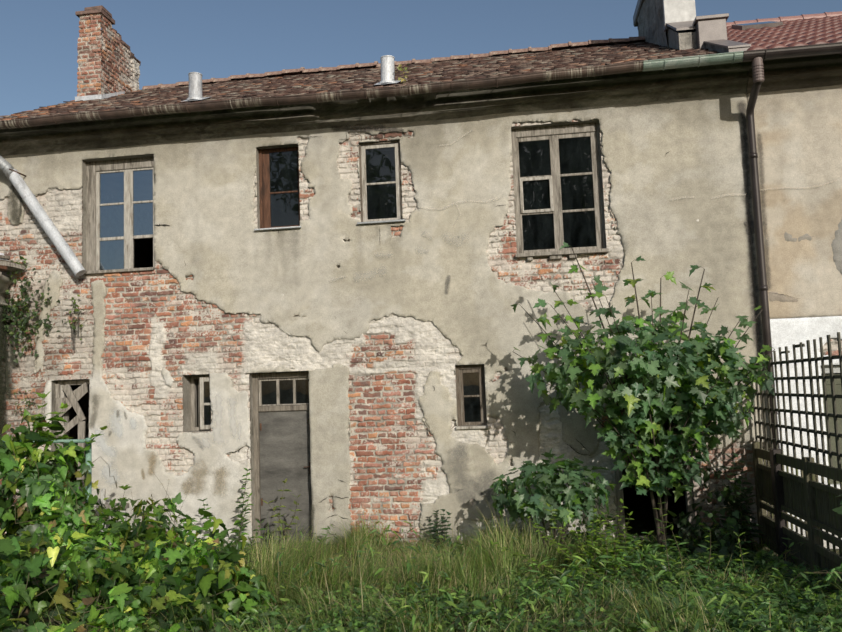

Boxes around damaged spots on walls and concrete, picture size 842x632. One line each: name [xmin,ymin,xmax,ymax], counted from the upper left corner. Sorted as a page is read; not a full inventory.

flaking render [297,137,315,221]
flaking render [337,131,414,220]
flaking render [391,163,418,238]
flaking render [486,119,625,310]
damp [739,102,764,371]
flaking render [0,187,463,549]